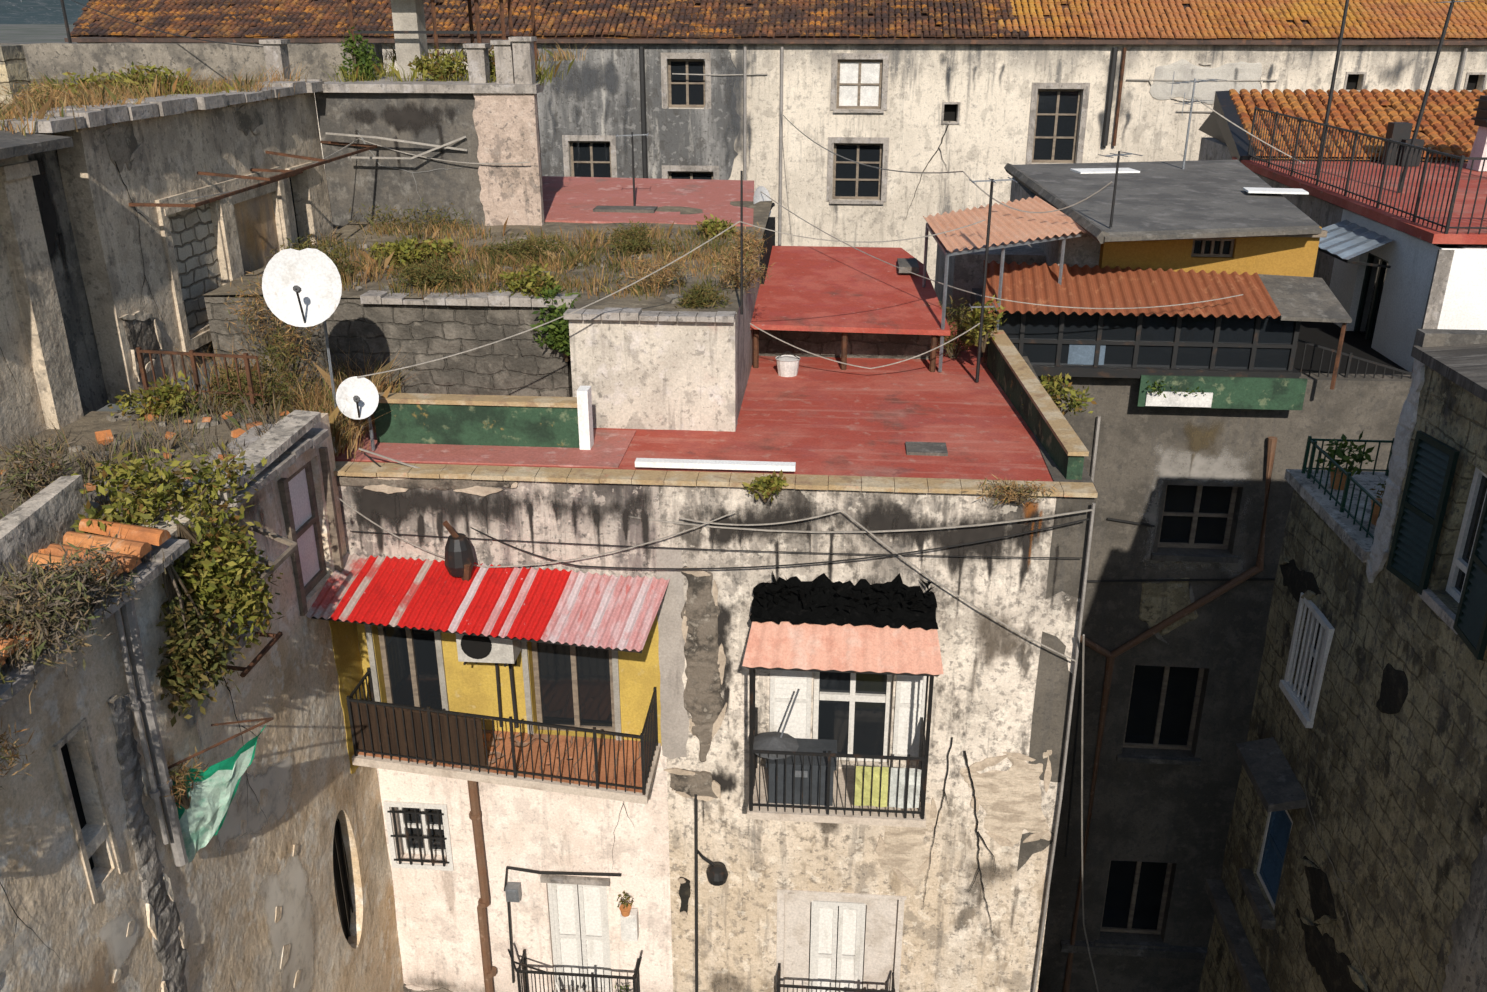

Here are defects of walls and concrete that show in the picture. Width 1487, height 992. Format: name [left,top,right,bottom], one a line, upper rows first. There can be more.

leakage [353,487,650,560]
leakage [709,501,845,580]
leakage [862,503,1055,599]
spalling [1279,558,1321,602]
flaking render [664,566,727,801]
spalling [1376,663,1408,714]
spalling [1296,856,1371,992]